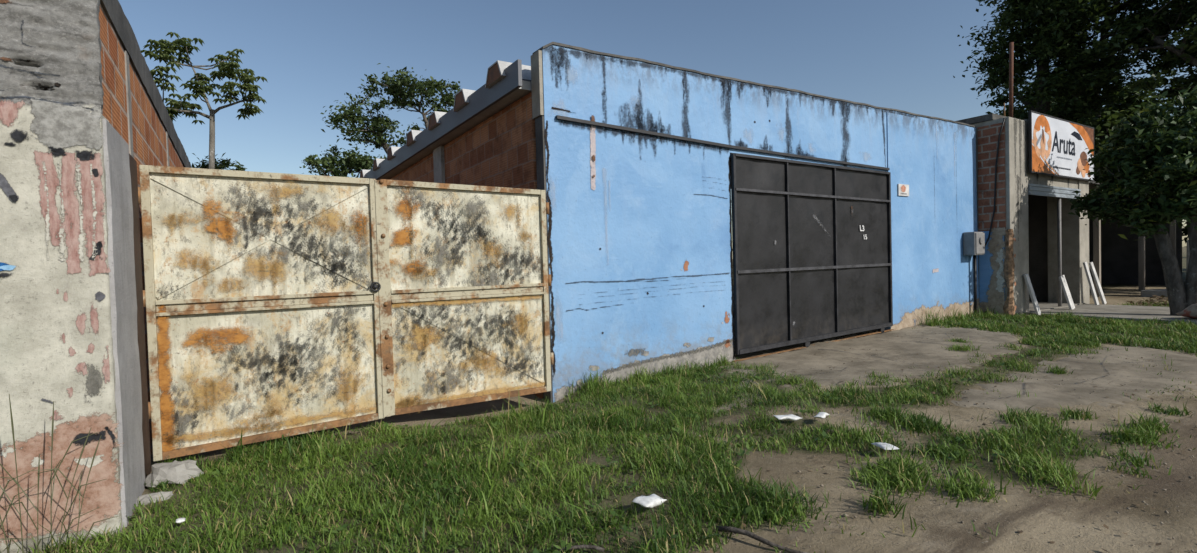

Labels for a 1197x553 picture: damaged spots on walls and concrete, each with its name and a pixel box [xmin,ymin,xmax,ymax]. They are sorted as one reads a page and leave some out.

damp [546,46,916,167]
peeling [0,82,111,276]
peeling [61,302,110,384]
peeling [0,410,124,544]